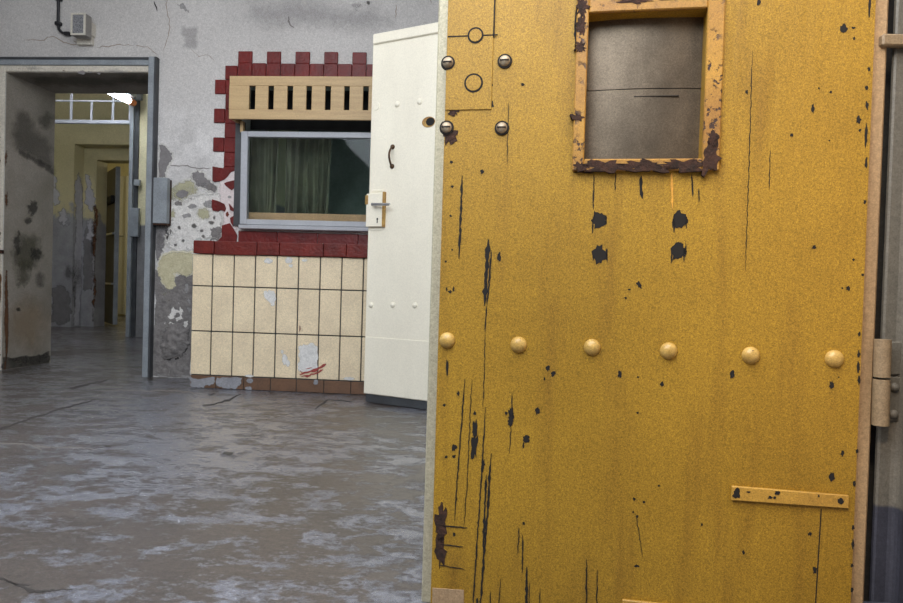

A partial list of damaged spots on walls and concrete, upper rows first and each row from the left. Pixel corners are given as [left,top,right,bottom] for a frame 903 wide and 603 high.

crack [32,0,170,55]
damp [14,232,41,282]
spalling [153,143,253,390]
crack [0,380,241,455]
crack [0,578,72,593]